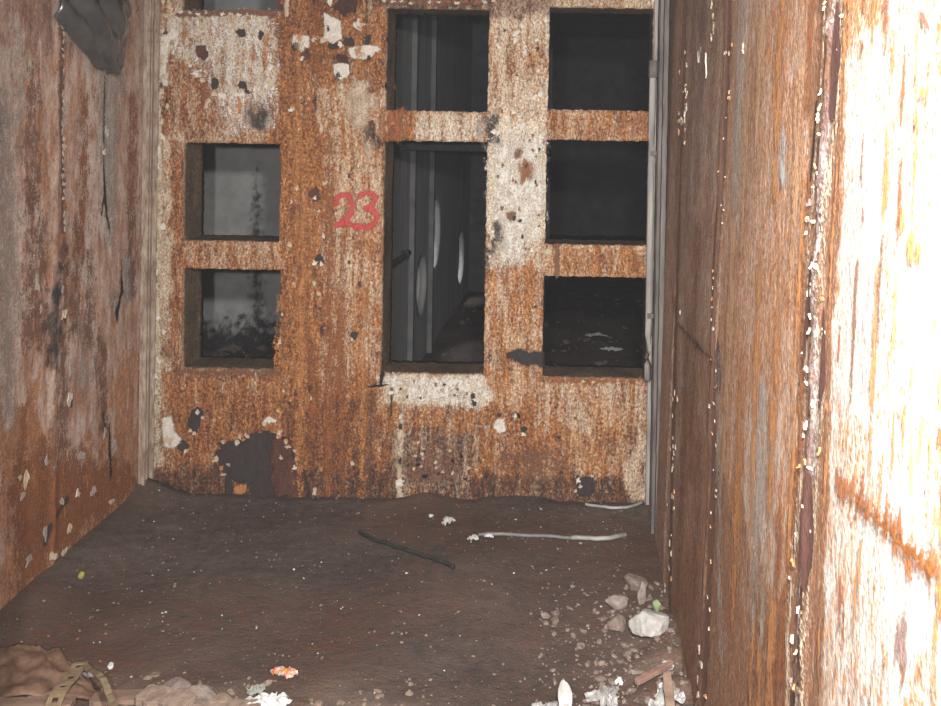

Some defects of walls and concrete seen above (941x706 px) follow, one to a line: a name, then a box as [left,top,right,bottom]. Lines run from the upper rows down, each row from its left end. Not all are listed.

corrosion [0,24,140,595]
crack [101,76,115,229]
crack [109,256,132,321]
spalling [212,416,317,497]
peeling [154,0,381,468]
corrosion [173,0,375,499]
corrosion [369,107,405,142]
corrosion [395,439,486,488]
corrosion [513,147,534,185]
corrosion [539,376,645,399]
corrosion [676,0,815,706]
corrosion [818,0,941,706]